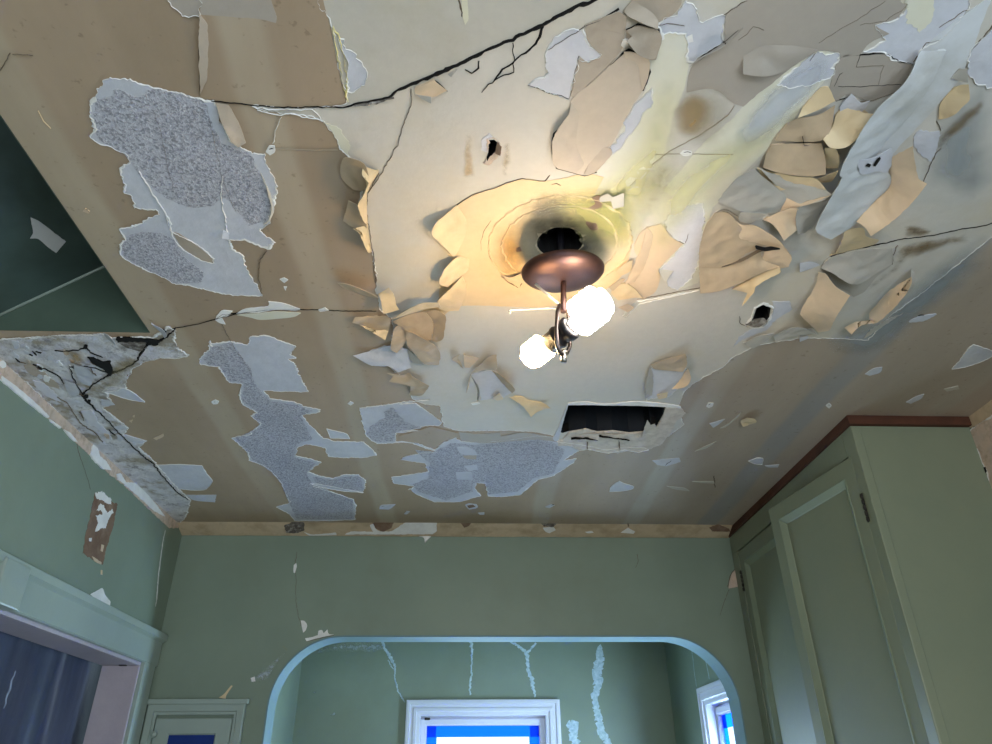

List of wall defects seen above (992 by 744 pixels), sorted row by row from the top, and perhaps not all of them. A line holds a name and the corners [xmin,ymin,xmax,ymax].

crack [211,0,597,189]
crack [168,251,375,374]
peeling [0,0,992,543]
water stain [583,204,617,228]
crack [831,223,992,265]
spalling [82,491,118,575]
crack [381,642,405,702]
crack [467,642,475,695]
crack [510,642,537,697]
crack [566,644,612,744]